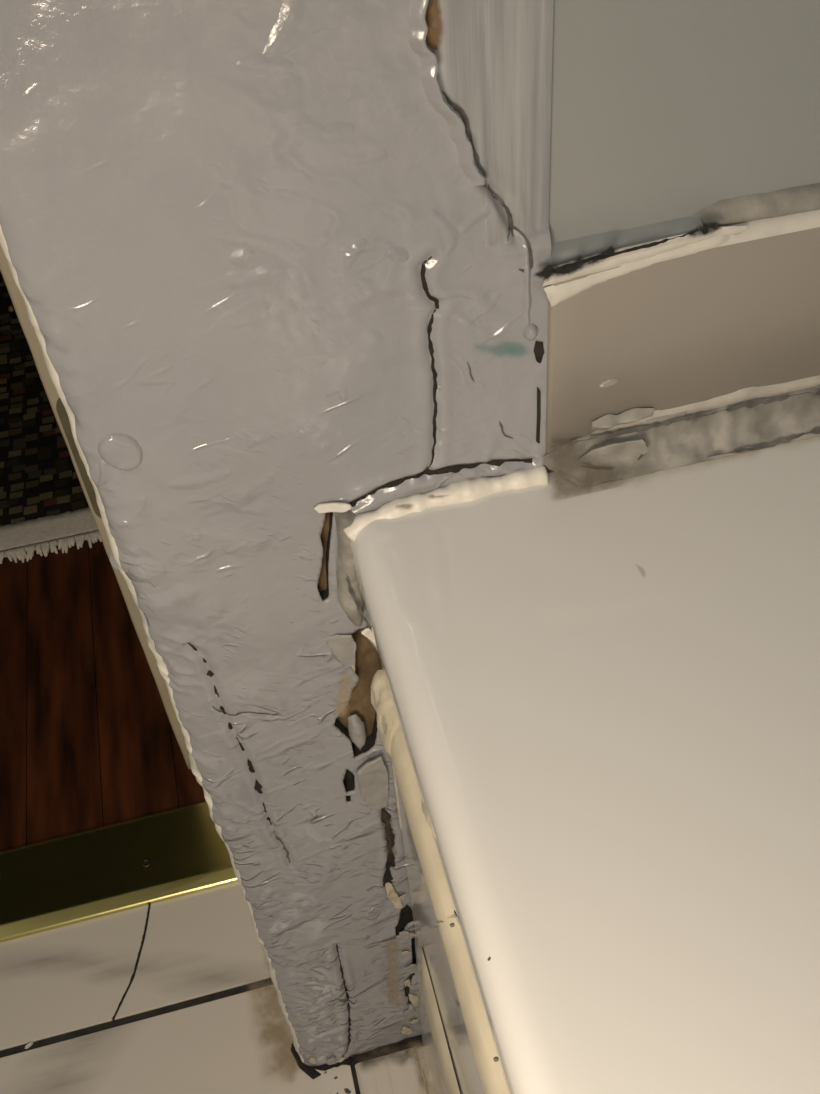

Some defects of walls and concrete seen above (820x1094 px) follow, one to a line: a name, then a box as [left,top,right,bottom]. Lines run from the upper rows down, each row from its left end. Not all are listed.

crack [484,180,533,272]
crack [563,233,688,266]
crack [314,256,820,513]
spalling [323,627,389,812]
peeling [385,882,419,1035]